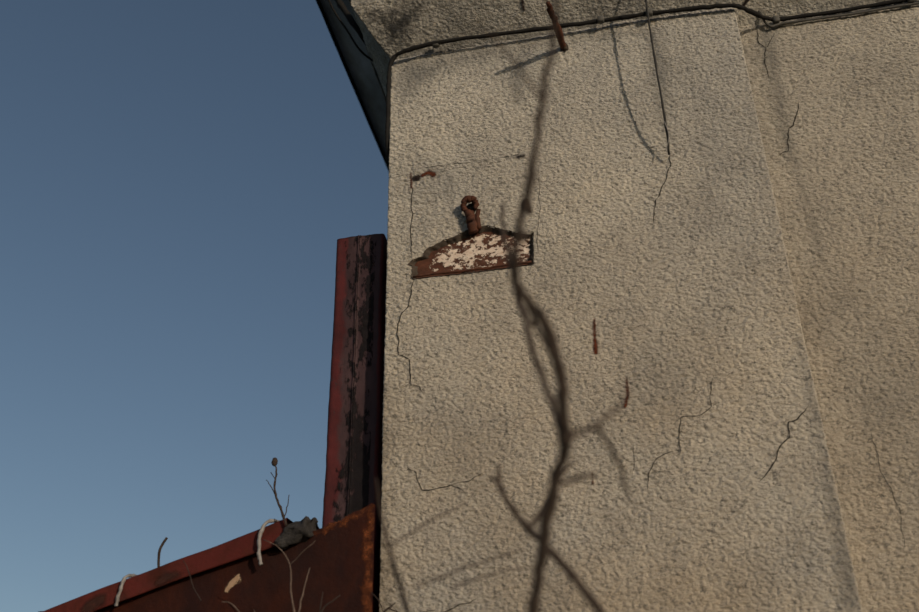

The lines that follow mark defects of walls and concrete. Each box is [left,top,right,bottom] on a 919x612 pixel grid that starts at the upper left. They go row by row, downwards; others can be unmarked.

crack [757,30,774,77]
crack [779,102,799,155]
crack [410,155,516,253]
crack [653,153,671,223]
peeling [408,225,534,280]
crack [395,281,421,390]
crack [622,375,714,488]
crack [760,408,808,481]
rust [324,508,374,611]